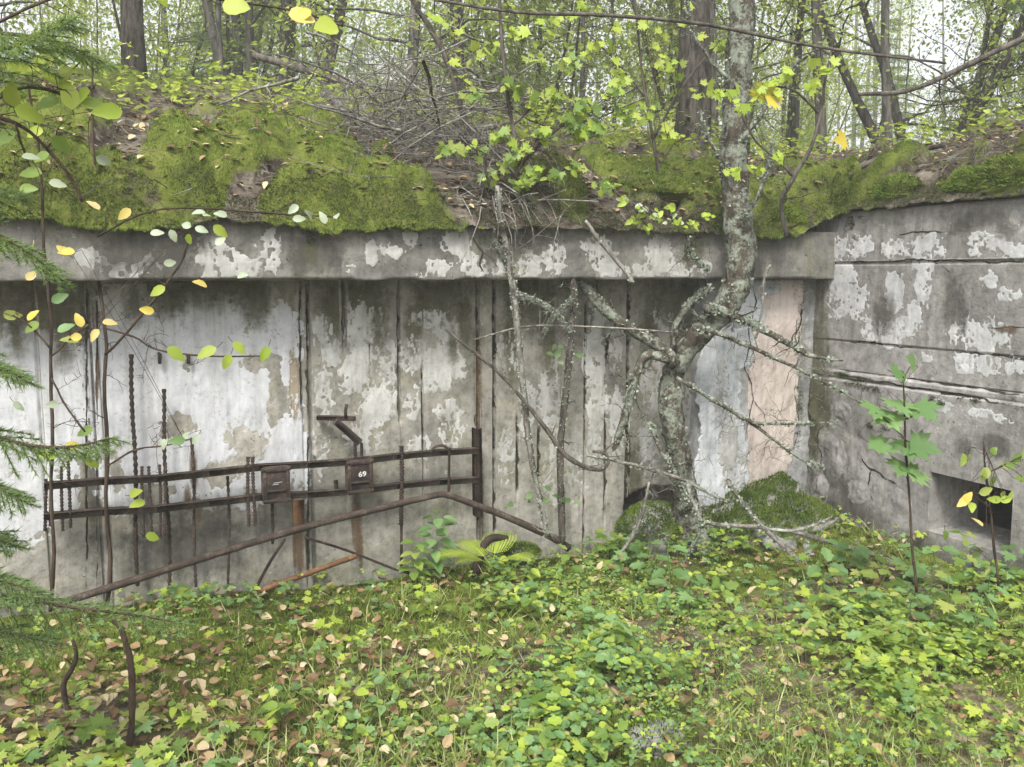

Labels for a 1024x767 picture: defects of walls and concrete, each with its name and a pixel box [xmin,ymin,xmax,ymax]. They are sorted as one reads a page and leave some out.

peeling [416,229,568,278]
peeling [967,224,1024,261]
peeling [826,232,946,350]
peeling [978,269,1022,302]
peeling [945,315,1024,377]
peeling [0,227,468,551]
flaking render [713,280,804,492]